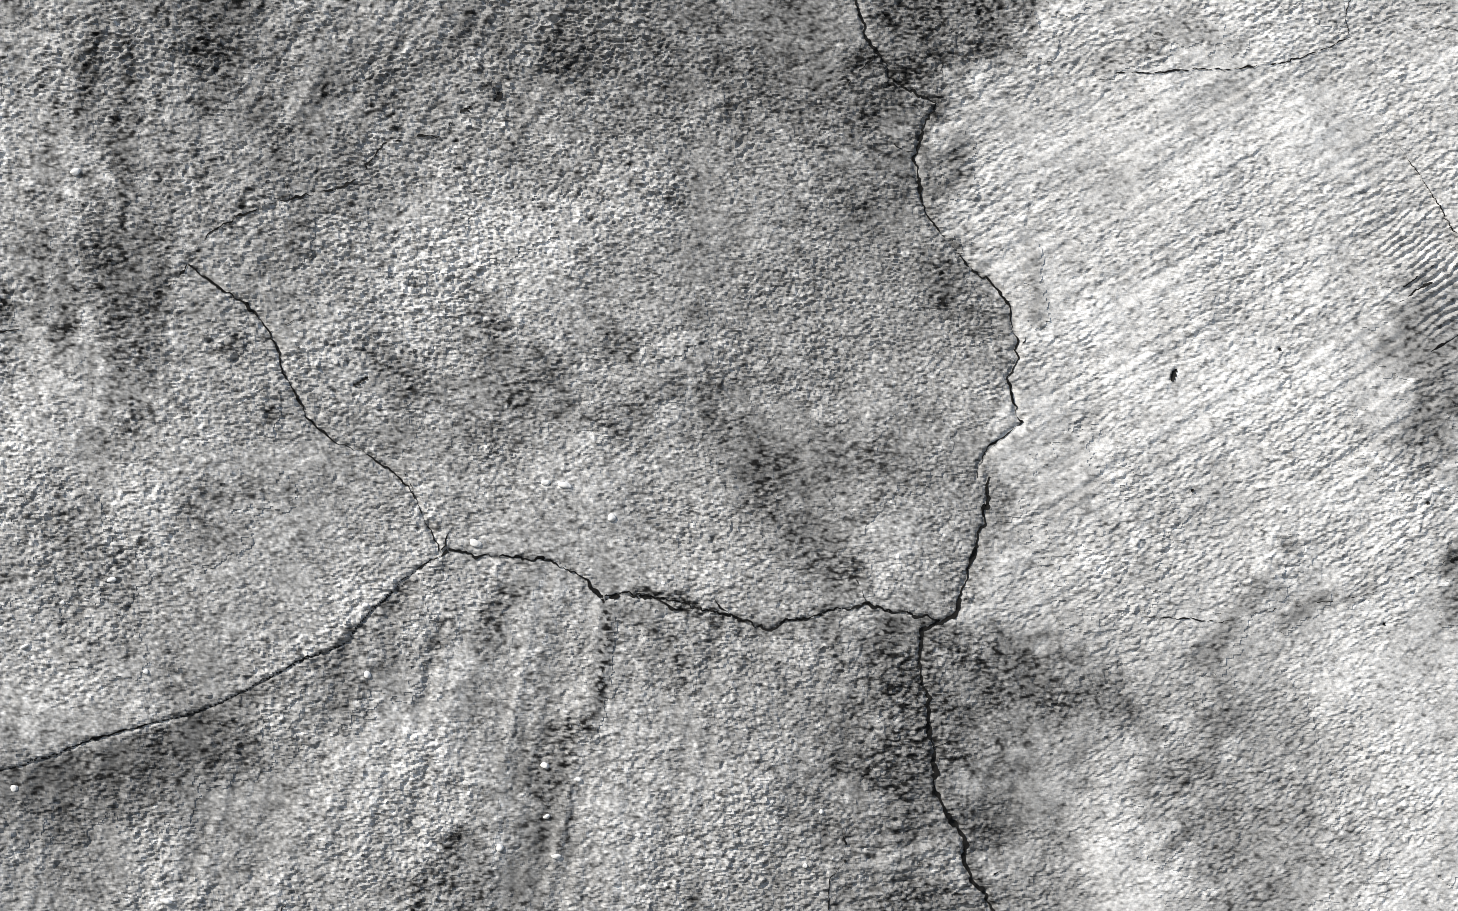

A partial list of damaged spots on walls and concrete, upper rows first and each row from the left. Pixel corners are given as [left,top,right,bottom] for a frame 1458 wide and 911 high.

crack [0,0,1026,911]
crack [1400,264,1436,302]